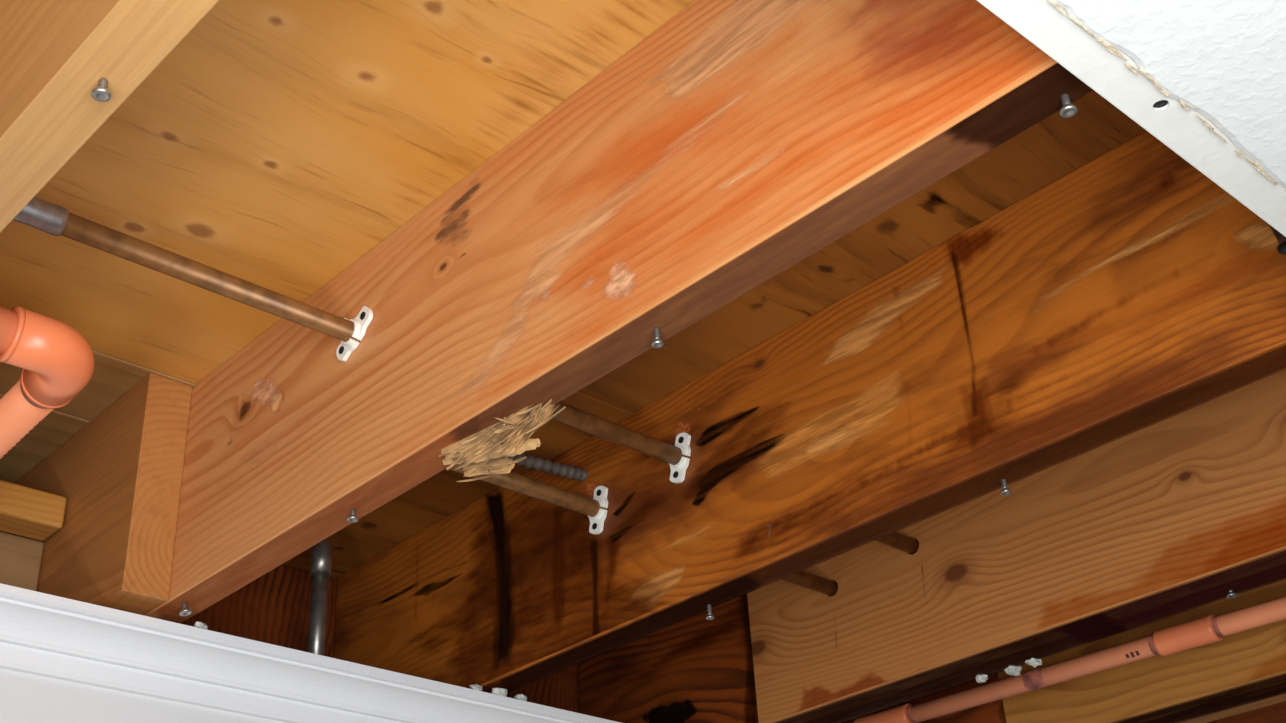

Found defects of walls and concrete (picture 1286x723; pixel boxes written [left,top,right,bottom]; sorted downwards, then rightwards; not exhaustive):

peeling [1048,0,1278,186]
damp [437,184,478,239]
damp [453,63,1093,441]
peeling [446,399,566,482]
crack [693,407,783,506]
damp [457,345,1286,723]